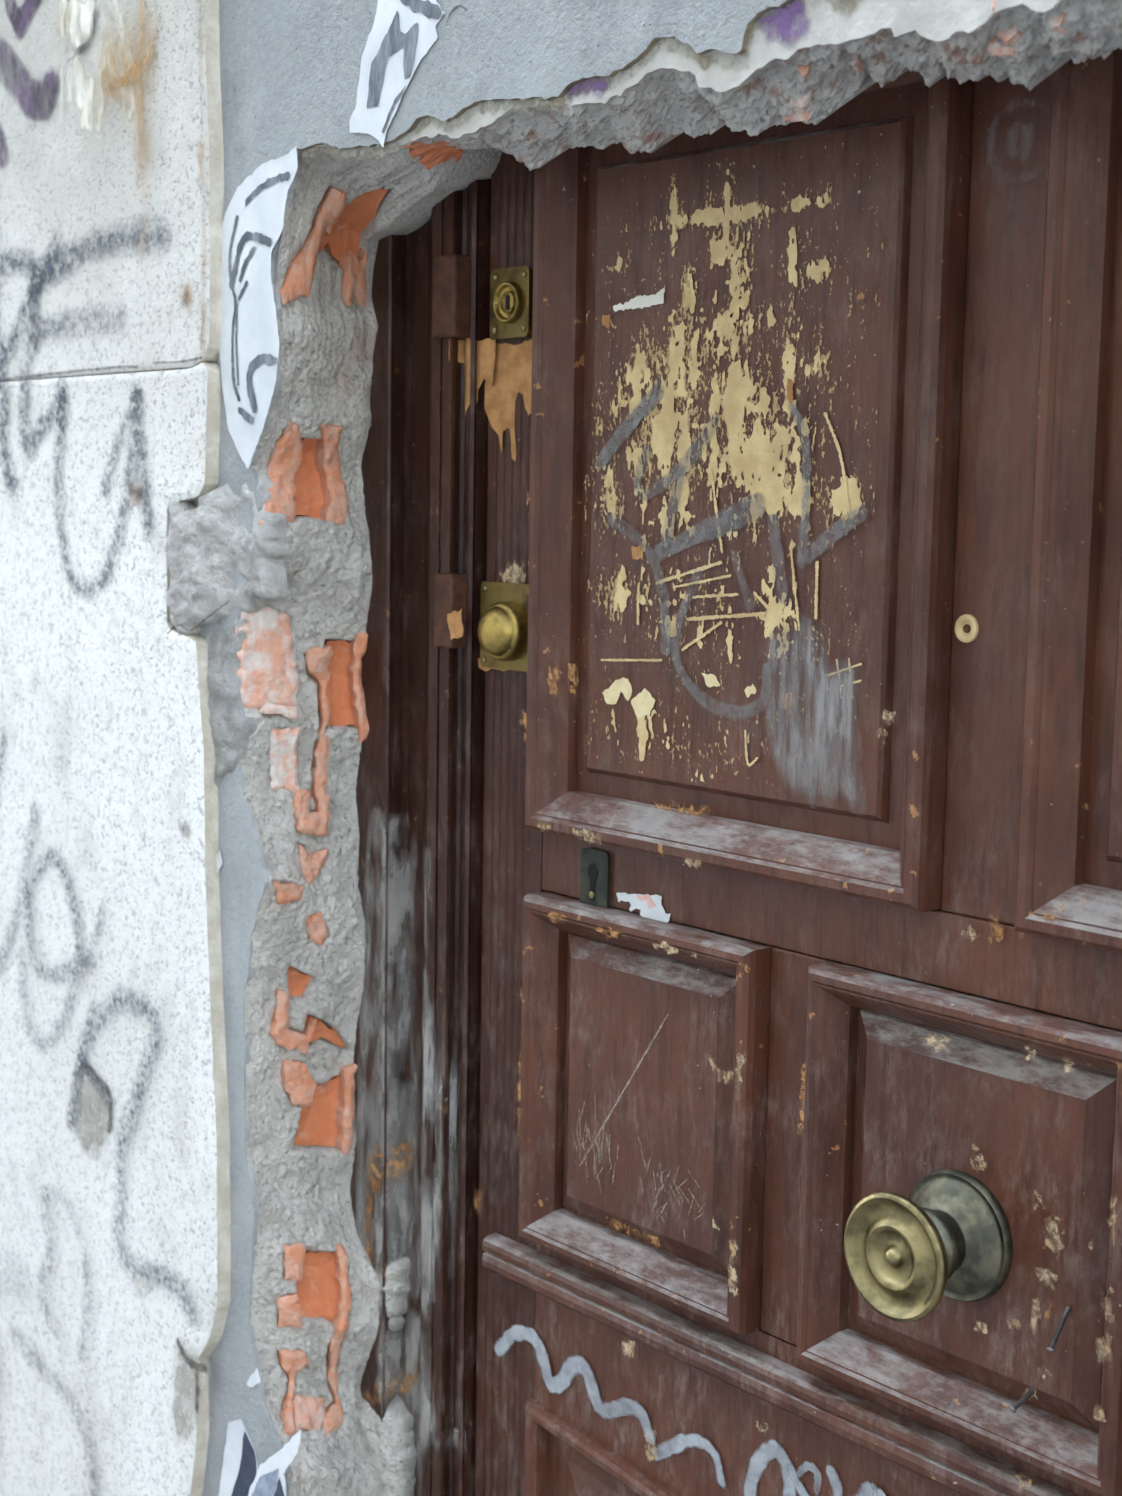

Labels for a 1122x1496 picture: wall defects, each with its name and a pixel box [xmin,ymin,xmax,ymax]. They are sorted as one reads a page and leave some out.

spalling [173,1338,207,1434]
spalling [205,0,1070,1496]